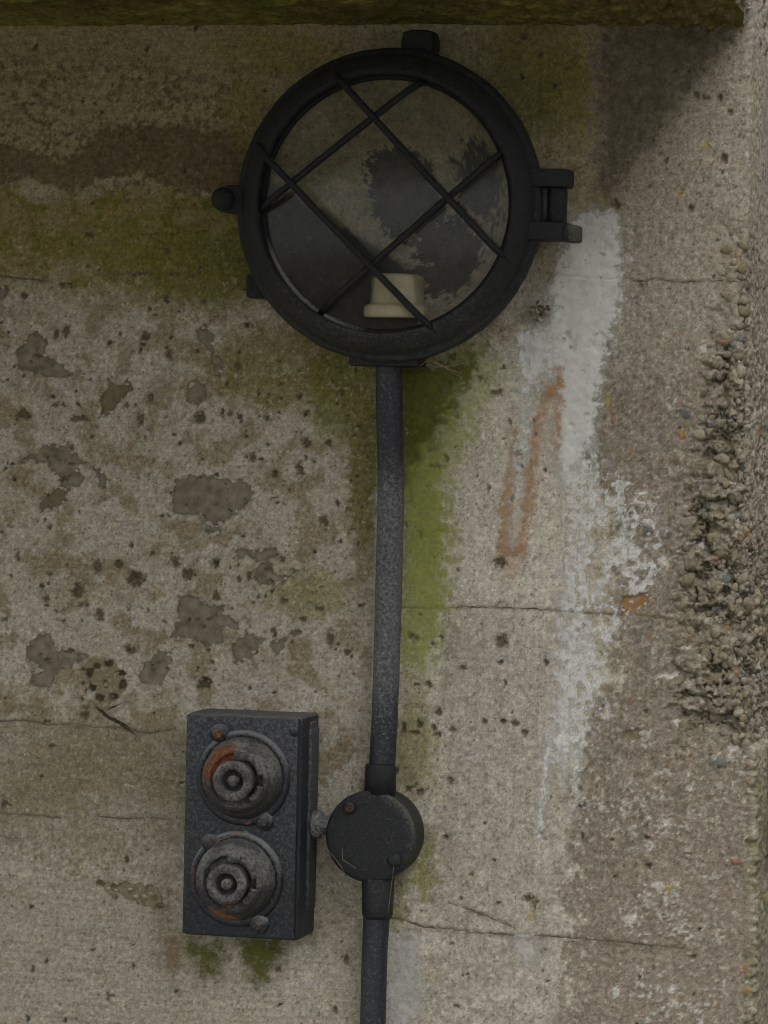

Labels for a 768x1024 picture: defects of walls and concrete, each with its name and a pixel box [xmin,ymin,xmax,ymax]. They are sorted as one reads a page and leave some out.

crack [572,275,741,293]
peeling [17,331,71,378]
peeling [100,378,133,417]
peeling [21,443,109,513]
peeling [172,474,254,536]
rust [499,368,563,554]
damp [505,204,668,843]
peeling [171,596,285,664]
peeling [26,634,126,702]
crack [391,903,680,949]